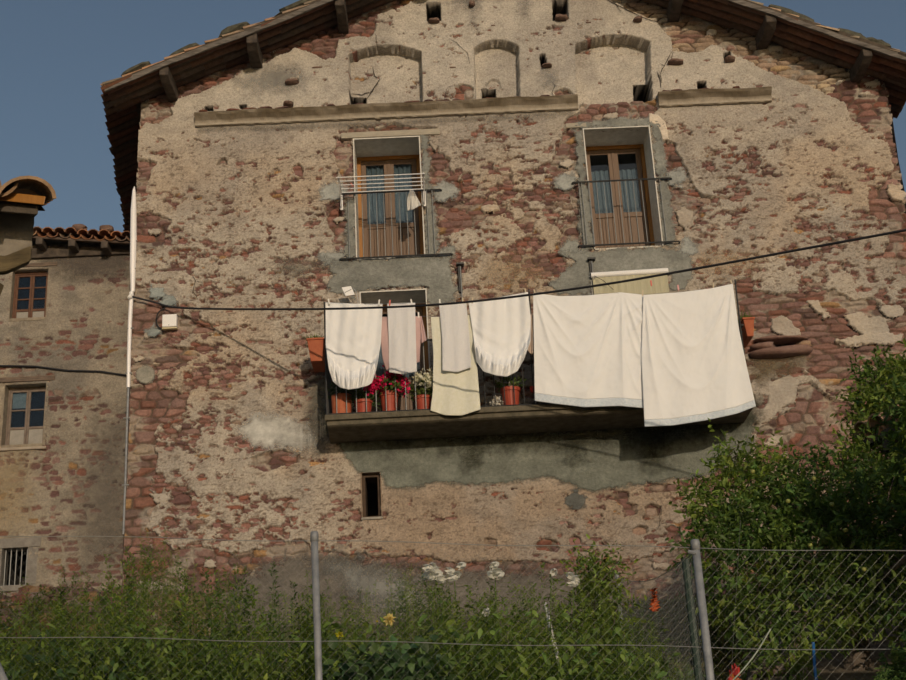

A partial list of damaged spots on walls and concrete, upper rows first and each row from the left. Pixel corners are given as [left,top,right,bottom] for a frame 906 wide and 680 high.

spalling [262,0,413,63]
spalling [140,61,251,129]
spalling [454,85,473,100]
spalling [137,161,156,195]
spalling [136,214,171,253]
spalling [426,139,507,236]
spalling [514,211,537,234]
spalling [549,99,719,242]
spalling [610,0,906,278]
spalling [131,286,215,373]
spalling [734,277,906,502]
spalling [123,383,738,603]